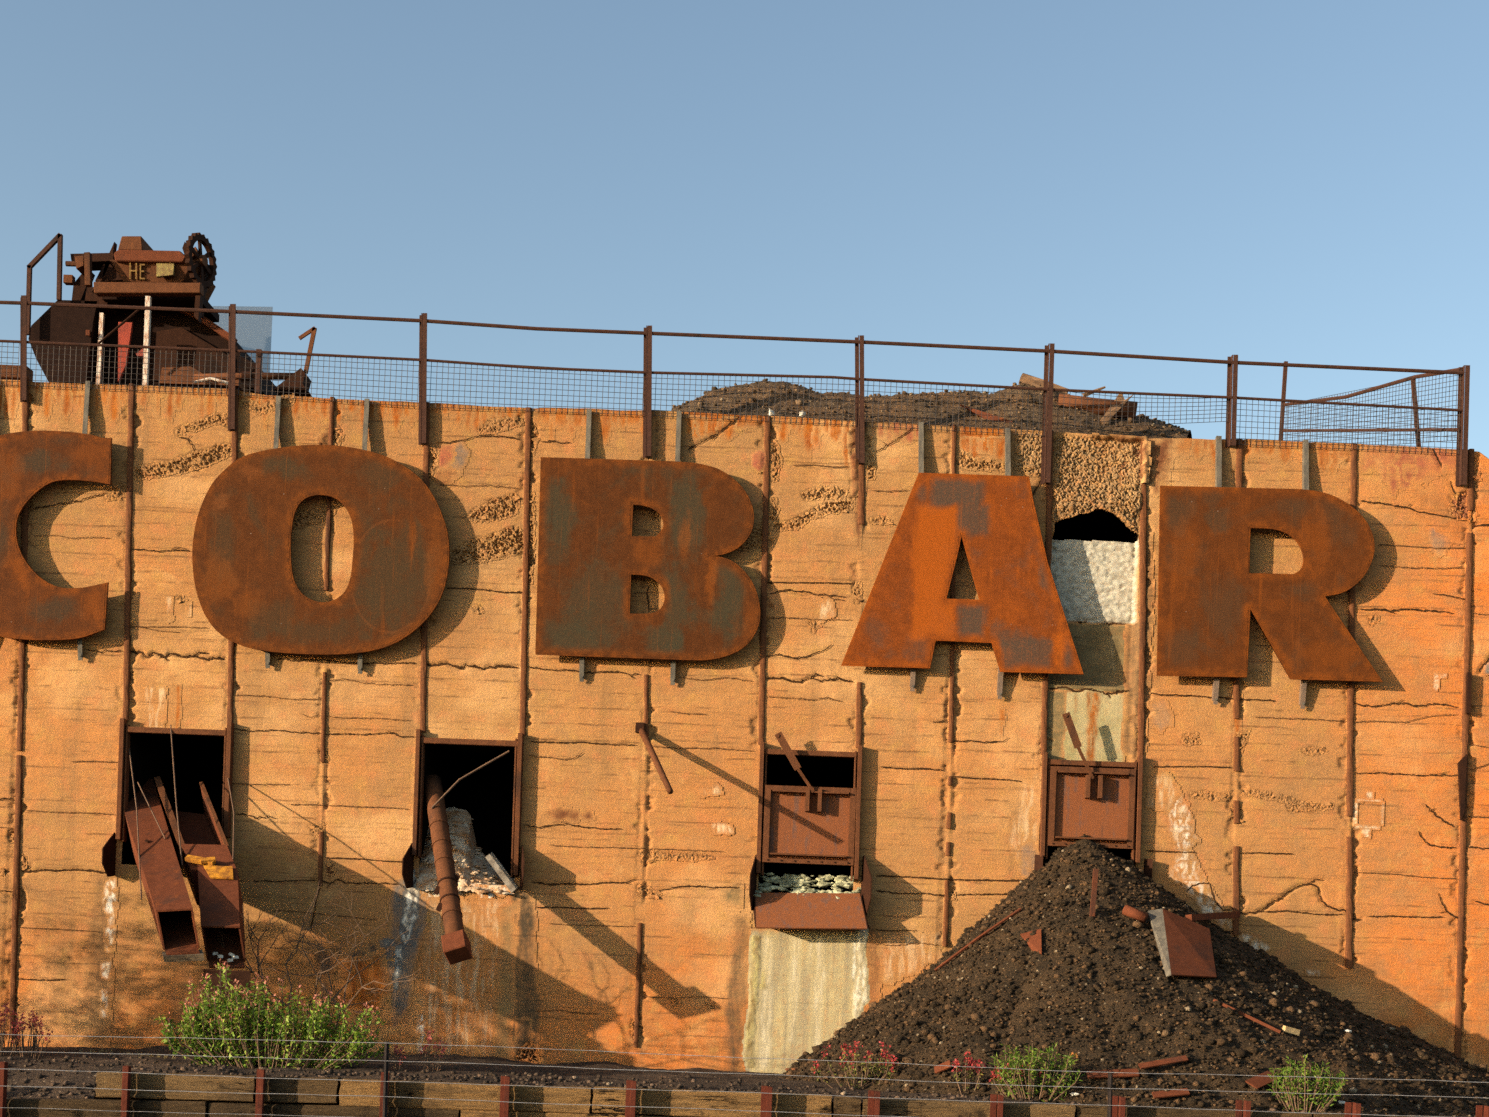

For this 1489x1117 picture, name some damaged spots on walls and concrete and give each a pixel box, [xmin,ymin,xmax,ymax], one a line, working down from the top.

spalling [957,432,1142,543]
crack [1360,448,1489,615]
water stain [1006,530,1174,879]
water stain [1145,772,1272,952]
crack [1050,686,1489,922]
water stain [342,866,547,1063]
water stain [719,911,943,1074]